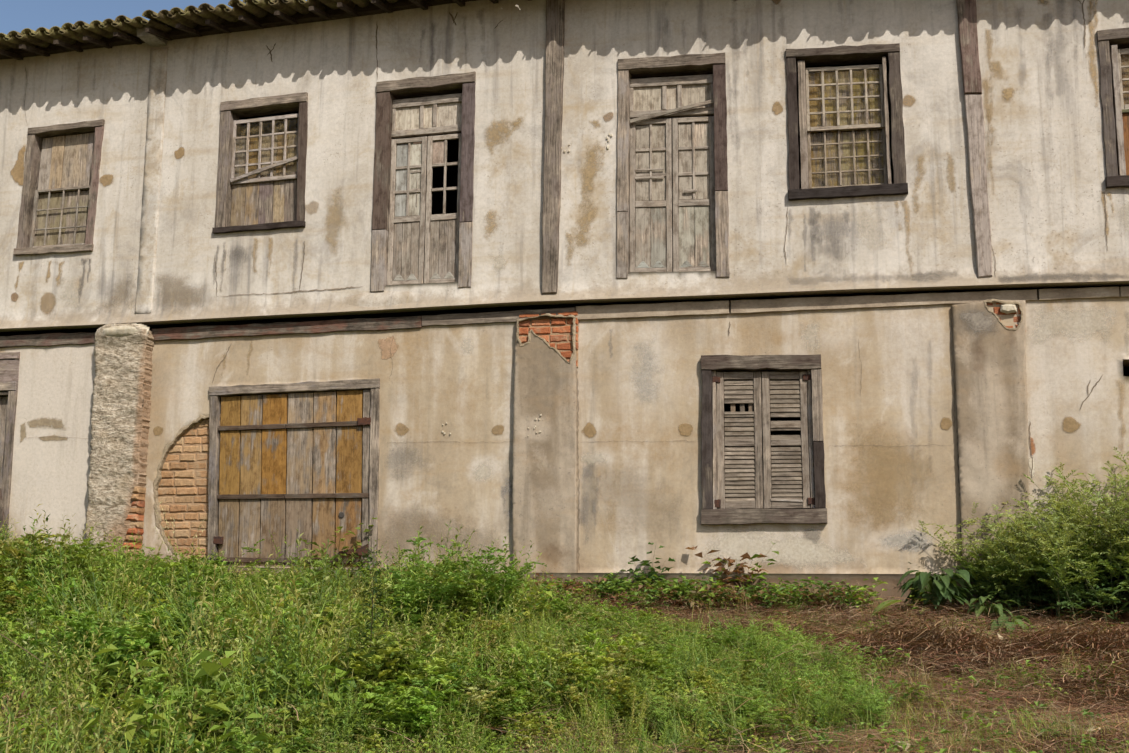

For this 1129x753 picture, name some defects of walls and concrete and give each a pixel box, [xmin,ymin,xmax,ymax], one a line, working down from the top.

crack [1078,0,1086,48]
flaking render [487,118,522,150]
flaking render [566,121,612,257]
leakage [913,273,940,281]
flaking render [983,299,1023,331]
flaking render [515,311,579,368]
flaking render [20,418,67,442]
flaking render [122,414,221,562]